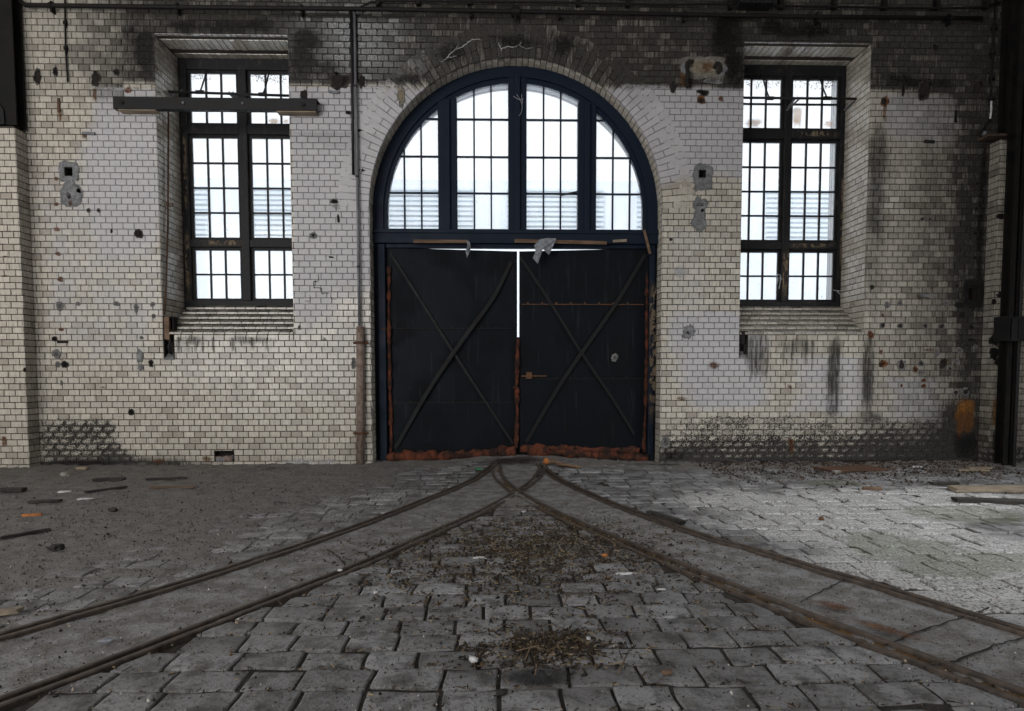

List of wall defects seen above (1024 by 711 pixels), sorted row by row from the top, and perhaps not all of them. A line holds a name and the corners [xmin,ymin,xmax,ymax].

crack [441,39,532,62]
spalling [54,167,83,194]
leakage [828,347,840,412]
leakage [863,339,881,423]